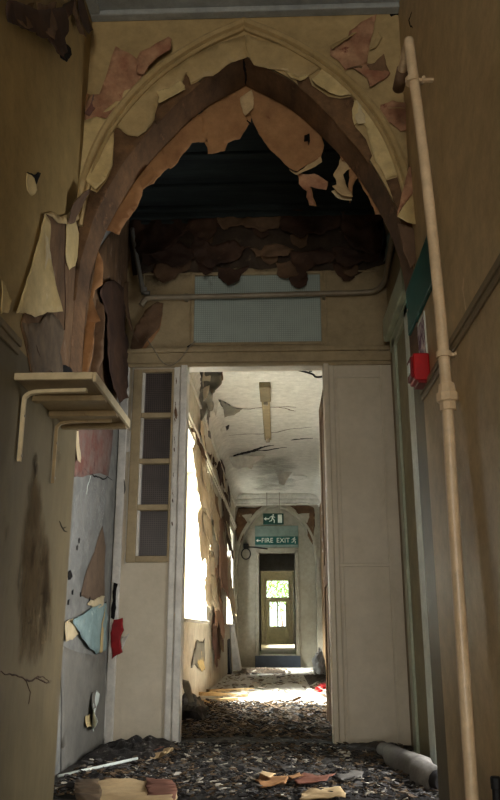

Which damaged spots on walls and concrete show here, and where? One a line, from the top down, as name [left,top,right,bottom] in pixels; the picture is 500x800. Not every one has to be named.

peeling [1,35,412,373]
peeling [85,219,385,405]
crack [219,400,312,469]
water stain [21,455,51,656]
peeling [68,526,118,620]
crack [1,671,50,704]
peeling [61,646,106,772]